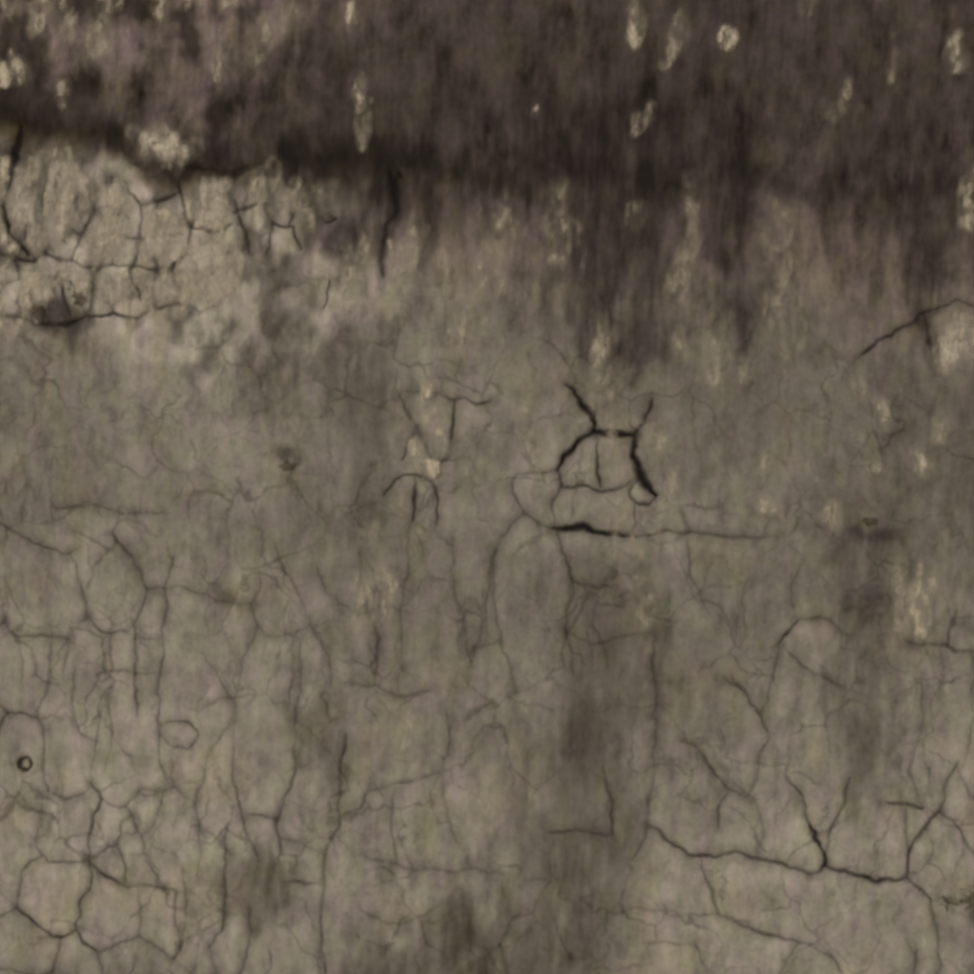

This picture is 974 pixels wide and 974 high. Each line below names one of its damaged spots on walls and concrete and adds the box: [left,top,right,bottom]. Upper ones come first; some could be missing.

water stain [346,1,354,24]
water stain [628,8,641,48]
water stain [718,26,738,50]
water stain [0,51,23,88]
water stain [0,157,9,195]
crack [0,124,302,326]
water stain [960,184,974,230]
crack [384,404,444,522]
crack [556,384,658,505]
crack [552,523,628,537]
crack [805,816,912,883]
crack [17,907,98,953]